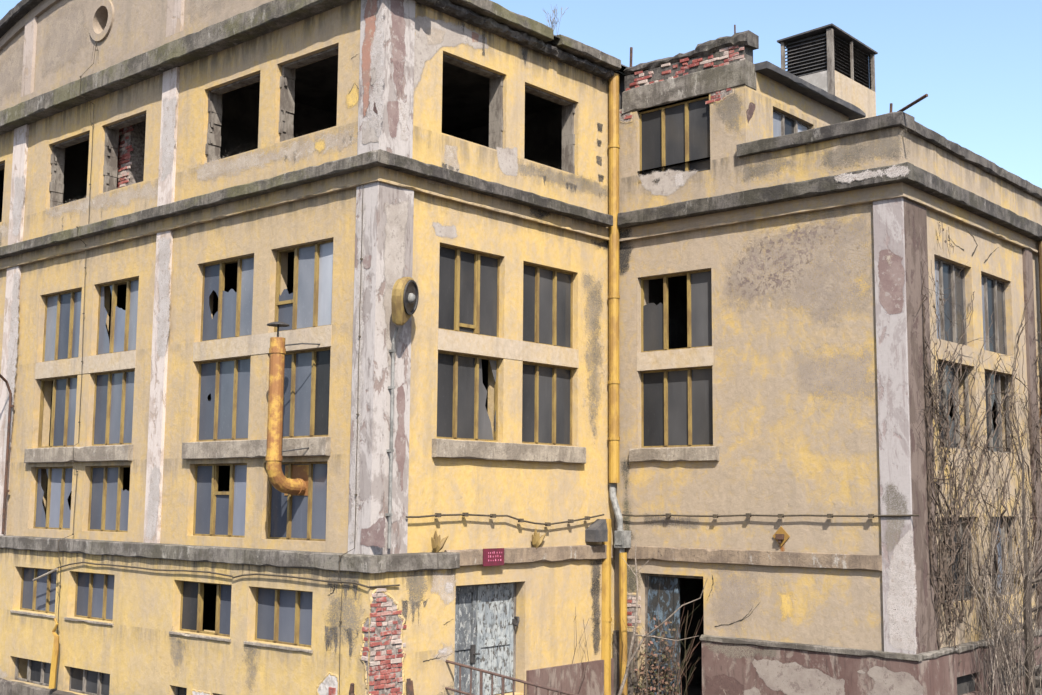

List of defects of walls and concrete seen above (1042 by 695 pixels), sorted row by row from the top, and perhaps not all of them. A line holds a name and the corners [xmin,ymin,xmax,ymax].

peeling [192,0,401,185]
peeling [414,15,489,93]
peeling [637,169,698,196]
peeling [834,165,911,183]
peeling [349,204,385,548]
peeling [395,383,406,492]
water stain [323,570,365,660]
flaking render [360,587,406,695]
water stain [401,570,429,626]
peeling [705,641,845,695]
peeling [857,666,924,695]
peeling [886,526,917,652]